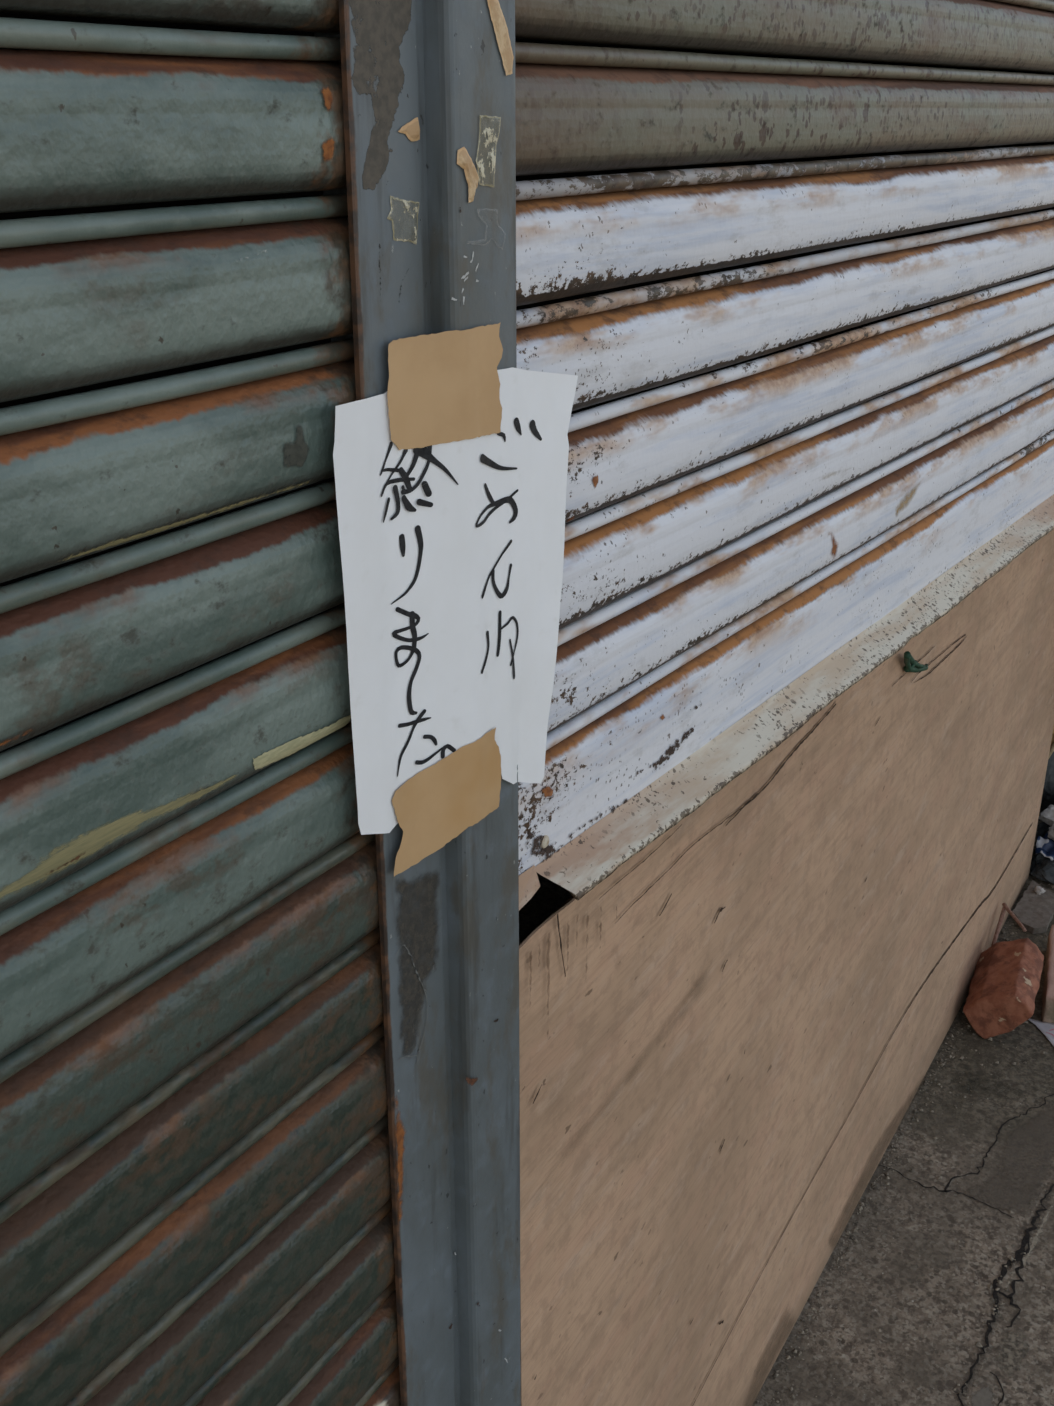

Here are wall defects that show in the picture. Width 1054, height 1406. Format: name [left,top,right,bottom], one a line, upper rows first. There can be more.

peeling [349,0,412,190]
corrosion [896,489,916,514]
crack [693,823,1033,1406]